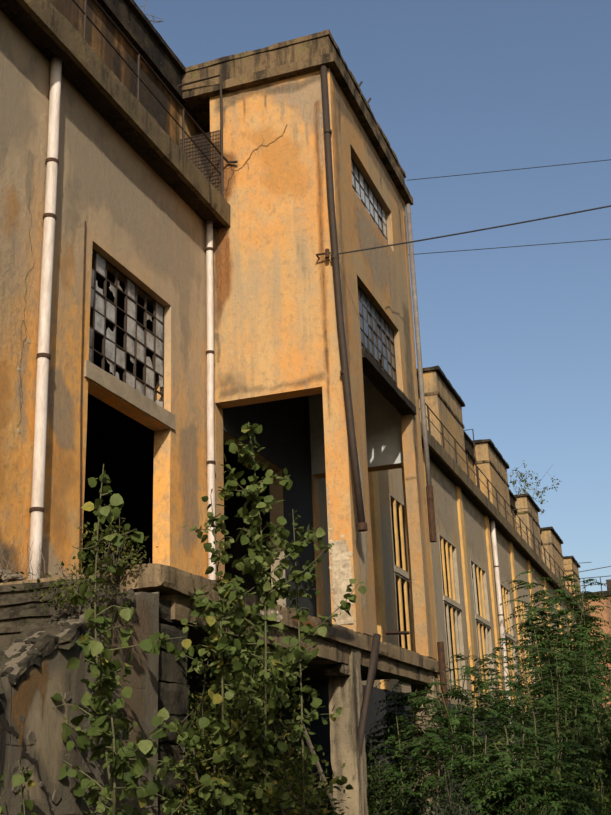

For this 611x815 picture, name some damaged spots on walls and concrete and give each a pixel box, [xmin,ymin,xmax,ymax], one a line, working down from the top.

crack [225,125,287,191]
spalling [329,455,367,625]
crack [0,704,54,815]
rust [11,663,47,745]